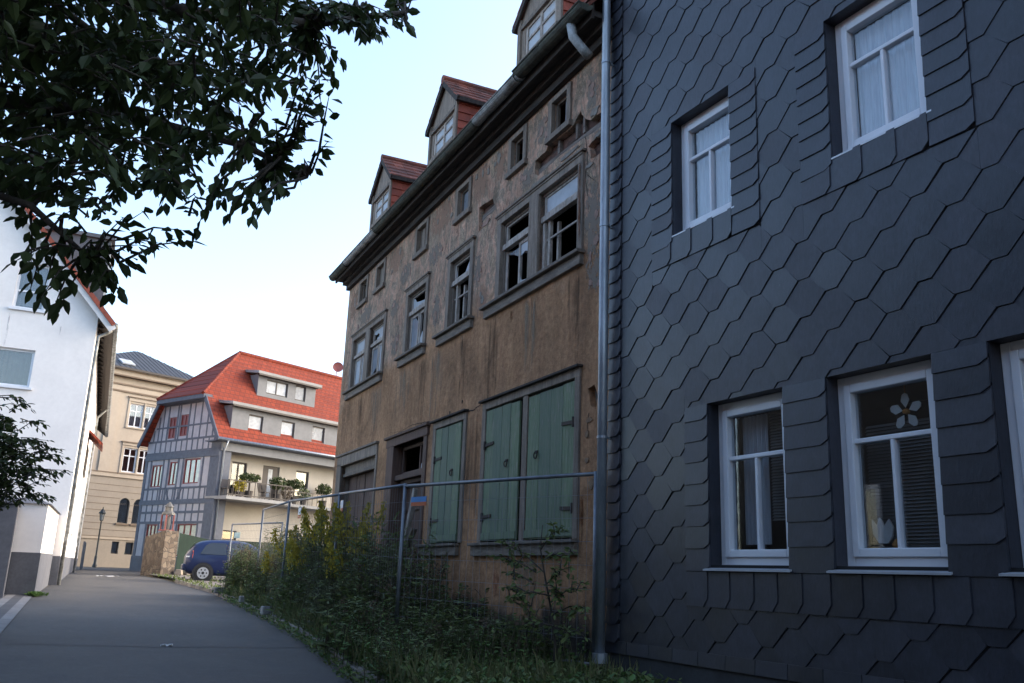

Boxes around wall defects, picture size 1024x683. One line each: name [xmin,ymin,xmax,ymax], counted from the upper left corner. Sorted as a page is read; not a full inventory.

flaking render [531,68,601,188]